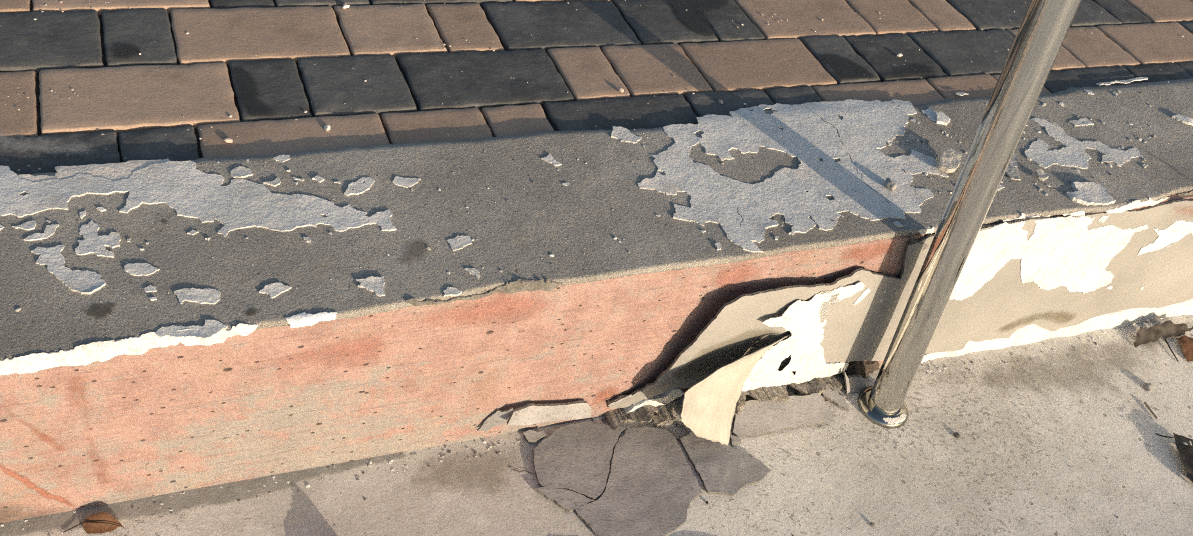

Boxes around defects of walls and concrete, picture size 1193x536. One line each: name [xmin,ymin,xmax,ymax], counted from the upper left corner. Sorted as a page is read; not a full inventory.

peeling [0,155,397,318]
peeling [392,176,421,192]
peeling [447,236,472,251]
peeling [611,99,951,253]
peeling [949,117,1193,300]
peeling [0,309,258,375]
peeling [285,312,337,328]
spalling [406,270,562,306]
spalling [477,282,886,536]
peeling [0,452,404,536]